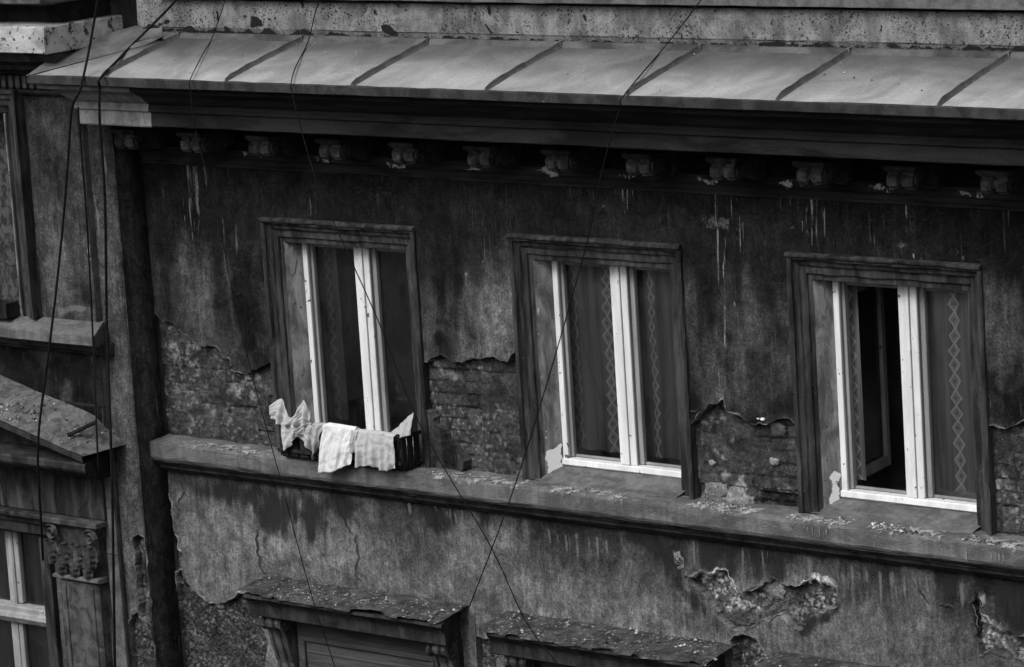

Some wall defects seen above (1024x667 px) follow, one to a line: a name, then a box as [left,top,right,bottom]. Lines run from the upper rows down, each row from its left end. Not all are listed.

flaking render [127,534,160,667]
flaking render [155,314,277,447]
crack [255,530,267,574]
damp [195,481,352,543]
flaking render [426,352,523,477]
flaking render [693,398,799,507]
flaking render [673,550,840,667]
flaking render [968,582,1024,667]
flaking render [989,419,1024,536]